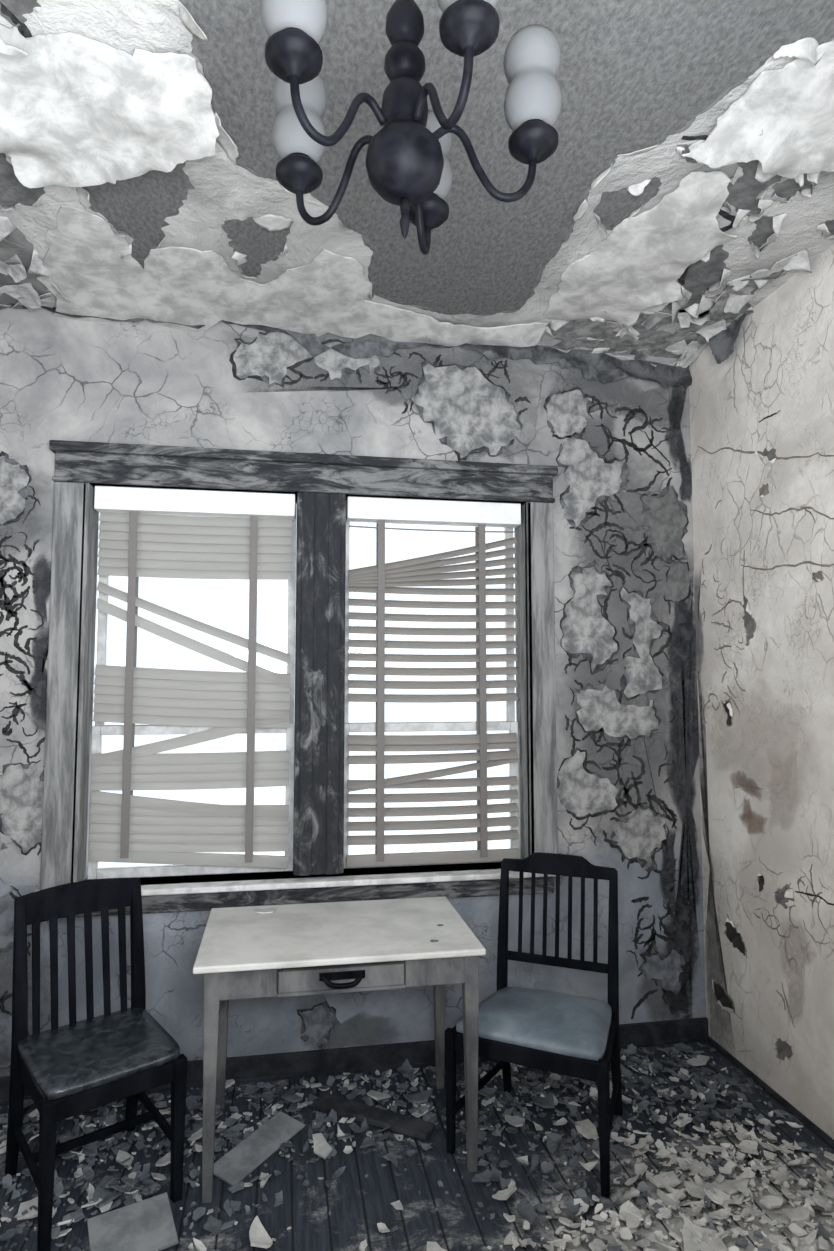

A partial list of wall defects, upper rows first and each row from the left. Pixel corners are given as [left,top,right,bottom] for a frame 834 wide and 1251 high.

peeling [0,0,834,388]
peeling [0,451,29,526]
peeling [411,360,523,461]
peeling [543,386,630,528]
crack [0,474,48,764]
peeling [560,486,693,741]
flaking render [742,596,756,646]
crack [564,394,834,1028]
peeling [557,747,666,872]
crack [9,886,22,899]
peeling [0,901,41,953]
crack [0,990,12,1003]